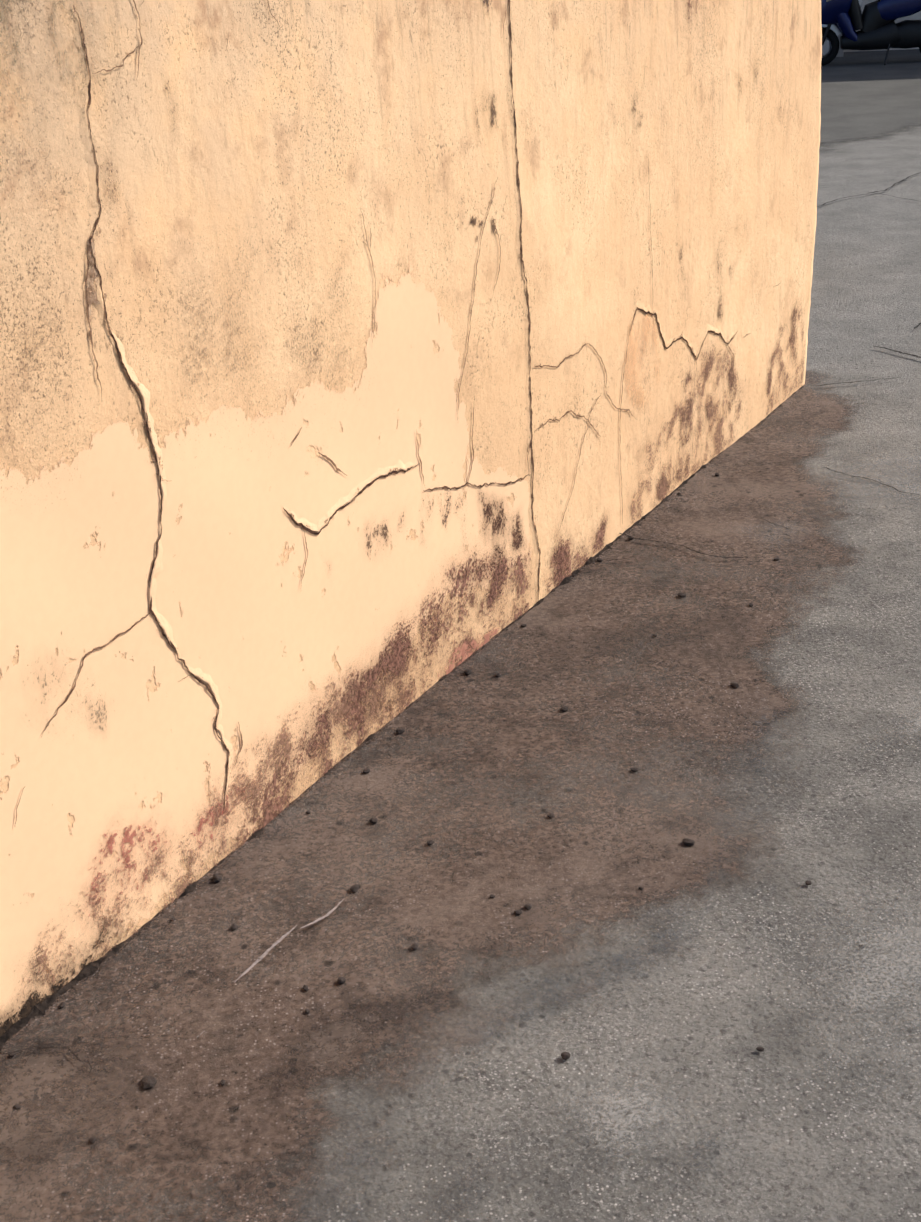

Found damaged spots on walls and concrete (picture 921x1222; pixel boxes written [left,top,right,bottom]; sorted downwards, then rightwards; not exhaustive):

spalling [86,237,107,340]
crack [41,0,243,812]
peeling [0,255,532,1026]
damp [12,493,608,1005]
crack [283,0,751,604]
damp [629,346,742,523]
damp [766,306,805,417]